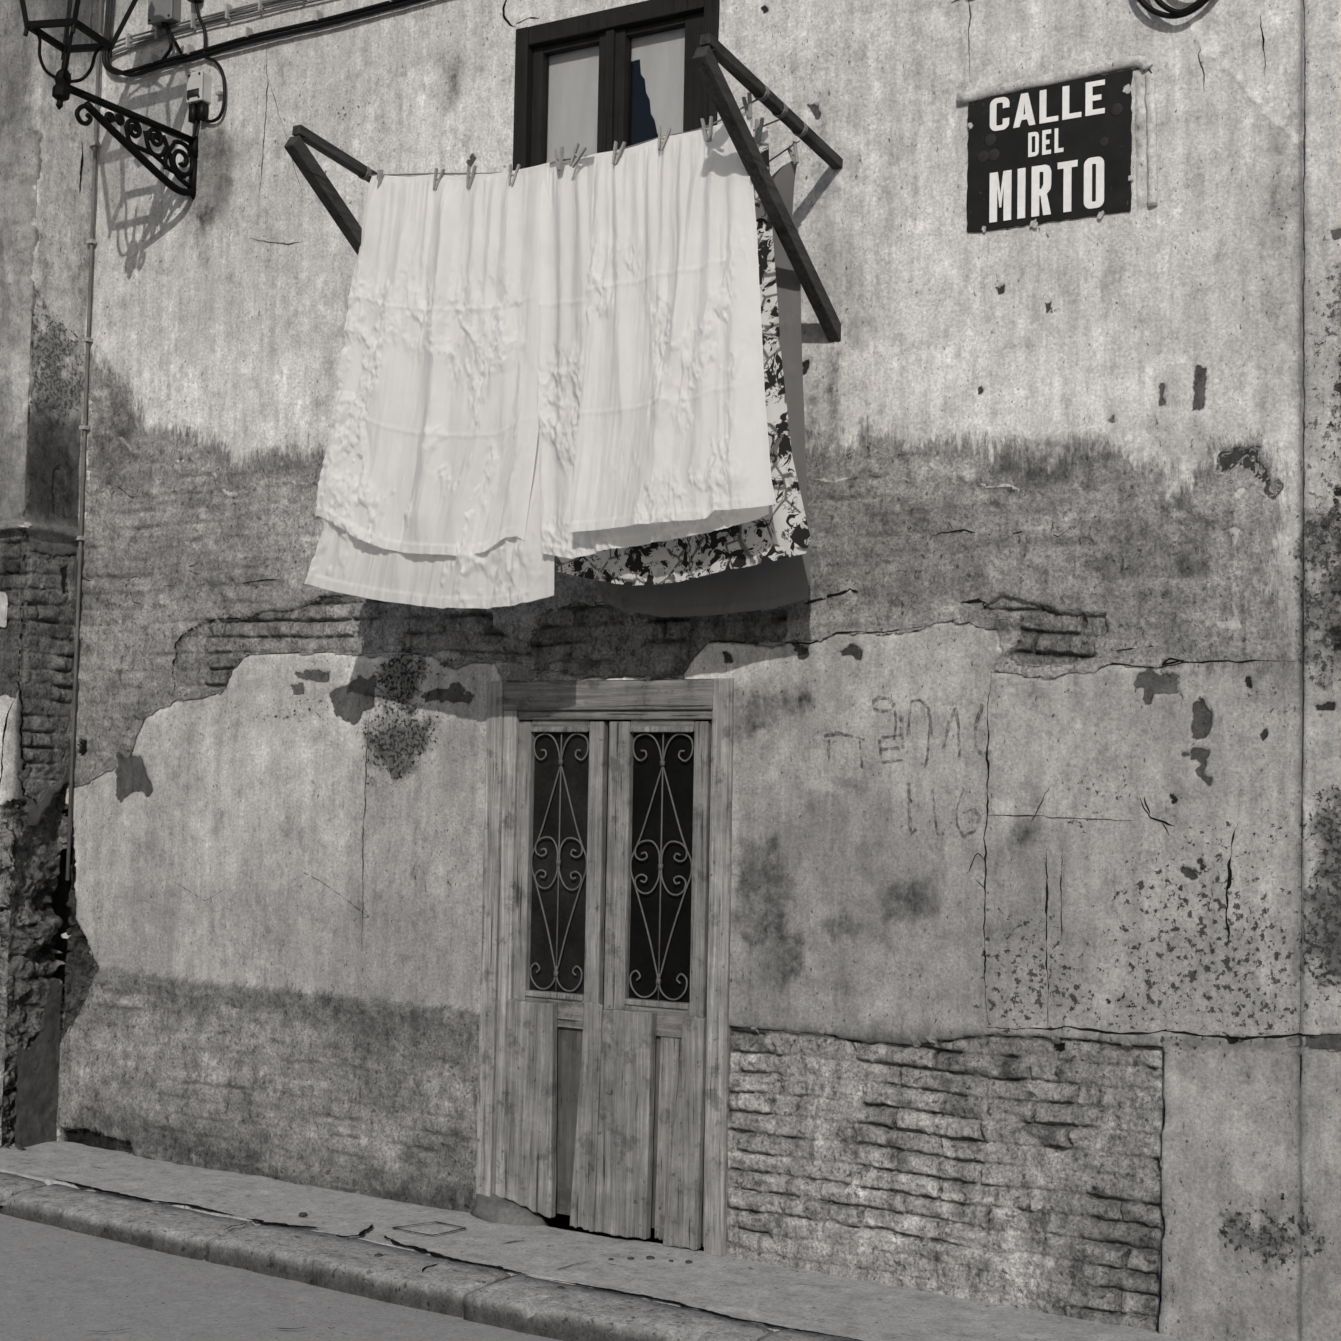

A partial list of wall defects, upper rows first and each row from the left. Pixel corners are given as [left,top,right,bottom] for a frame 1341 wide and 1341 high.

peeling [807,104,821,119]
damp [1001,443,1057,487]
crack [967,0,1341,1088]
crack [805,582,858,604]
crack [960,598,986,609]
crack [681,623,935,677]
peeling [0,266,1341,1213]
spalling [727,779,1341,1333]